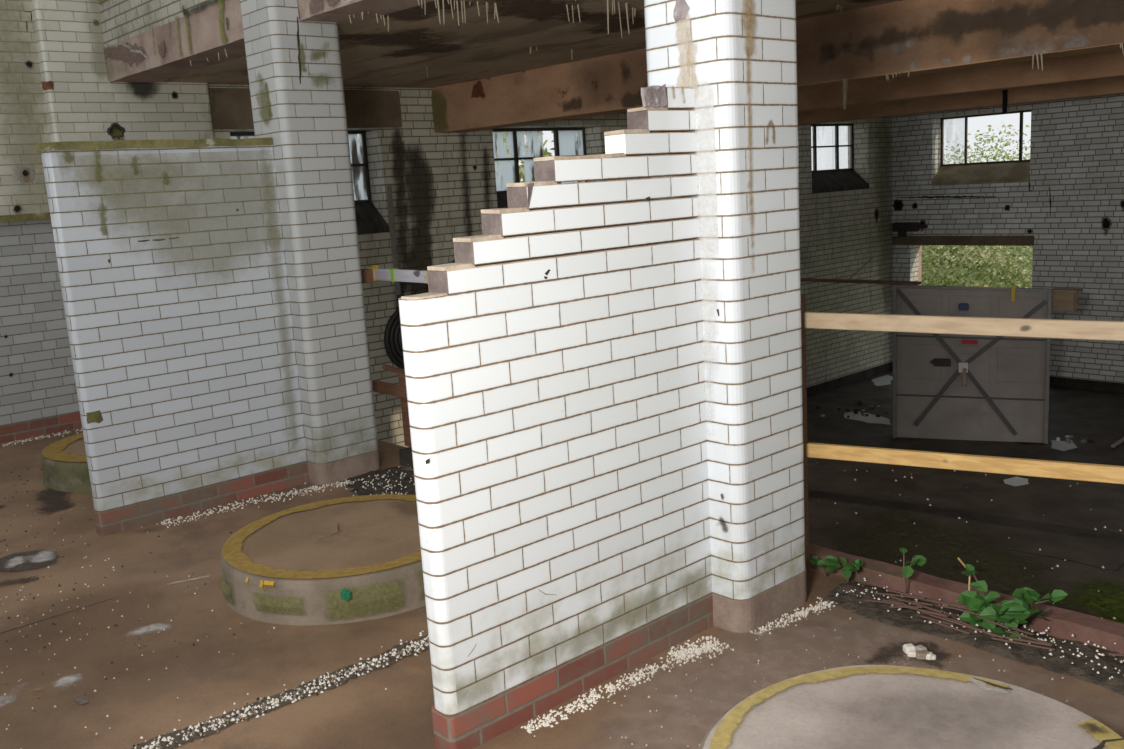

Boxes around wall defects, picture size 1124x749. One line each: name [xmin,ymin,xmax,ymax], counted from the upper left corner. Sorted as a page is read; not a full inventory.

spalling [673,0,690,23]
peeling [103,40,165,66]
corrosion [743,0,755,161]